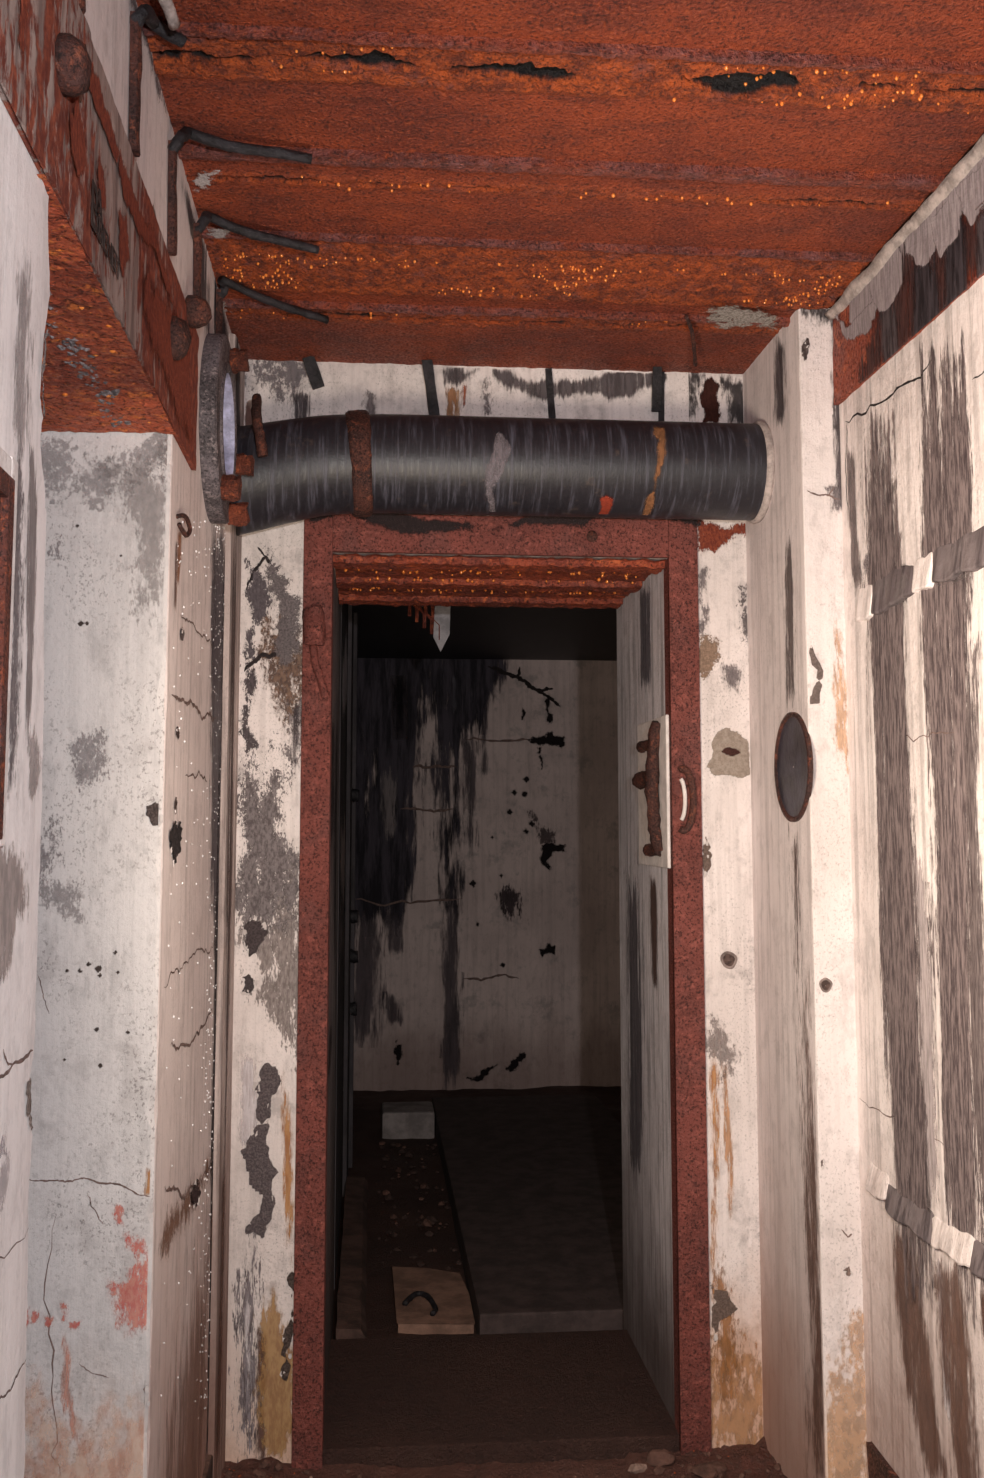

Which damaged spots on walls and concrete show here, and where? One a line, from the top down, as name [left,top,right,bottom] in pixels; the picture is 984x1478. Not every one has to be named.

corrosion [17,0,29,52]
corrosion [70,63,193,444]
damp [831,203,984,590]
crack [172,694,222,723]
damp [833,631,848,770]
crack [0,1049,33,1079]
crack [165,946,213,988]
crack [171,1009,213,1051]
peeling [235,546,303,1238]
damp [328,658,507,1087]
damp [866,572,984,1245]